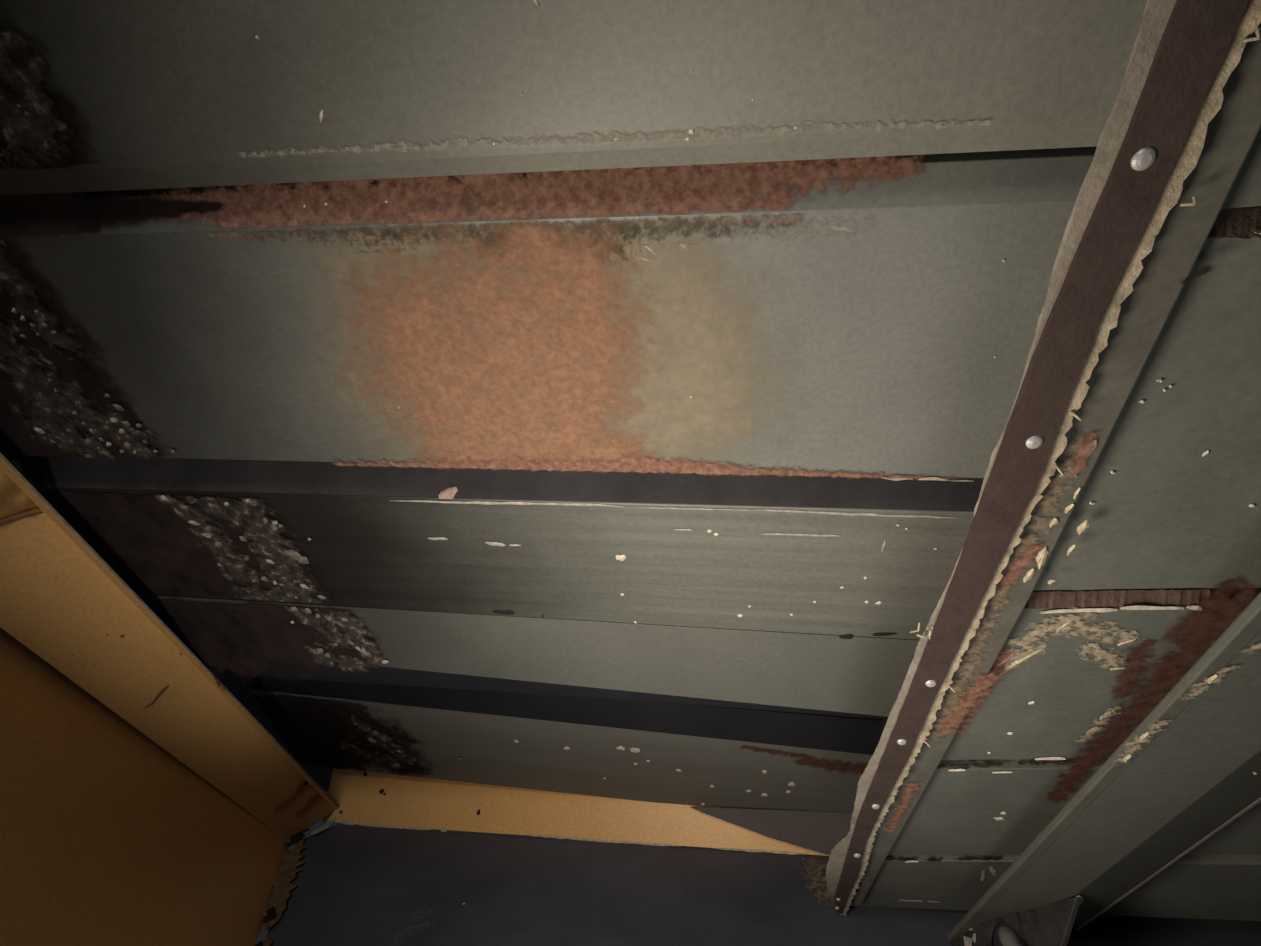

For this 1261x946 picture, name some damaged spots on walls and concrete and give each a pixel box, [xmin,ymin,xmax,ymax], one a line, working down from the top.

corrosion [0,155,974,482]
peeling [988,608,1141,677]
peeling [1179,643,1261,700]
peeling [1115,720,1172,763]